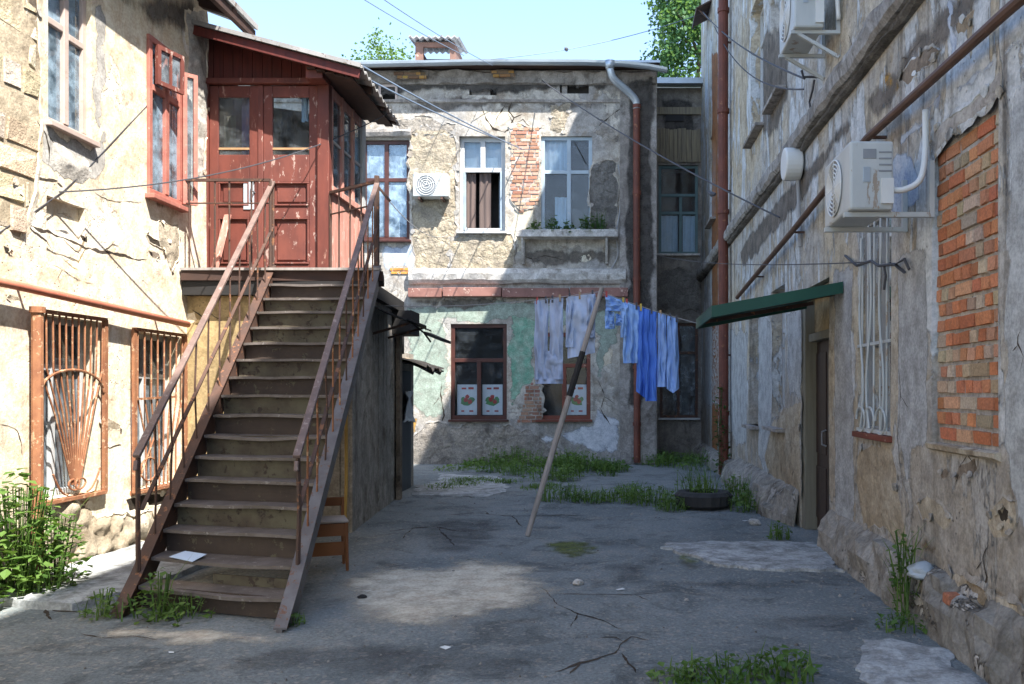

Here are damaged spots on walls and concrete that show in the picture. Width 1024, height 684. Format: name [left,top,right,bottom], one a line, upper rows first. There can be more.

crack [25,121,147,284]
crack [481,103,529,132]
flaking render [506,102,572,213]
flaking render [898,43,941,88]
flaking render [407,300,583,464]
peeling [595,310,620,377]
peeling [929,69,1024,541]